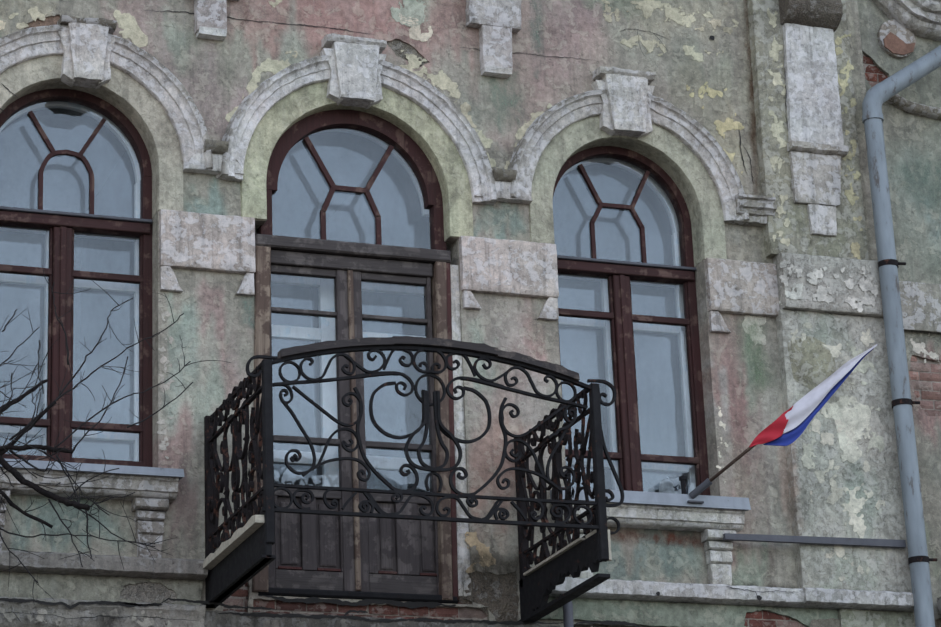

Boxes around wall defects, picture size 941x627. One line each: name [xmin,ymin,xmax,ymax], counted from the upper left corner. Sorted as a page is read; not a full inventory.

peeling [0,5,60,30]
peeling [387,0,510,170]
peeling [514,103,552,147]
crack [739,131,753,181]
flaking render [835,34,888,114]
peeling [779,130,878,312]
flaking render [909,333,941,416]